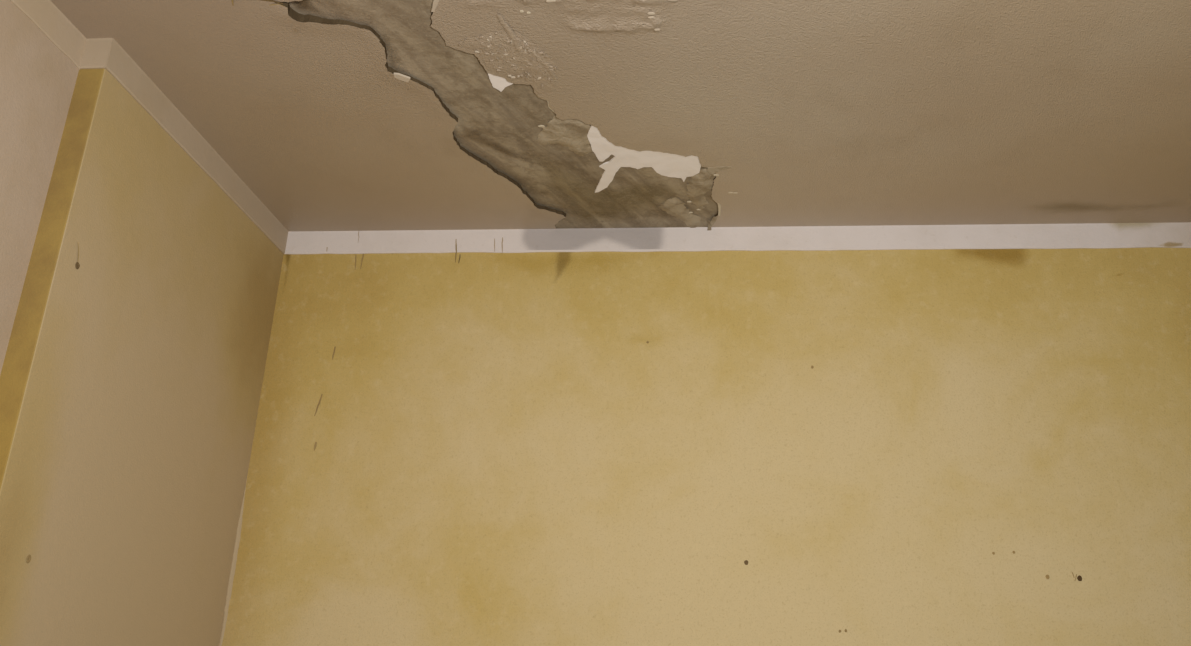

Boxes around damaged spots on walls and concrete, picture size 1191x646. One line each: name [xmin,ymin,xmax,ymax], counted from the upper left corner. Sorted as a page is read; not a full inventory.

spalling [274,0,738,230]